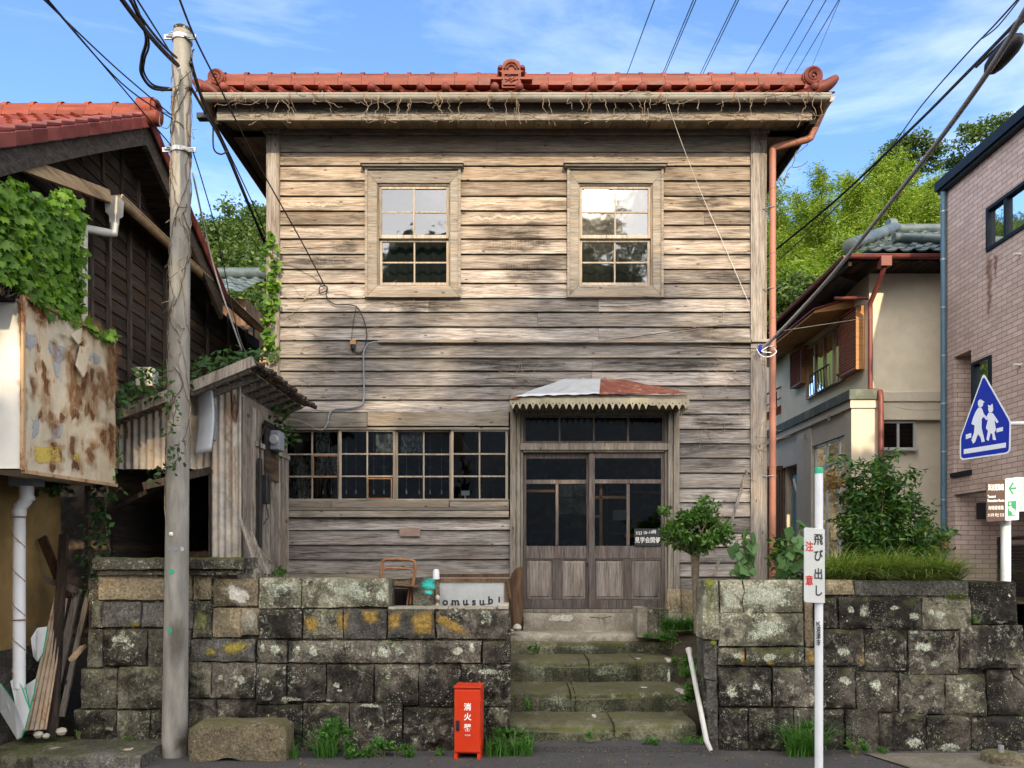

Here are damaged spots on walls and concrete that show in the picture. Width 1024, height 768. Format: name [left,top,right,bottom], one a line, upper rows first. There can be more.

rust [18,302,56,348]
rust [26,319,128,471]